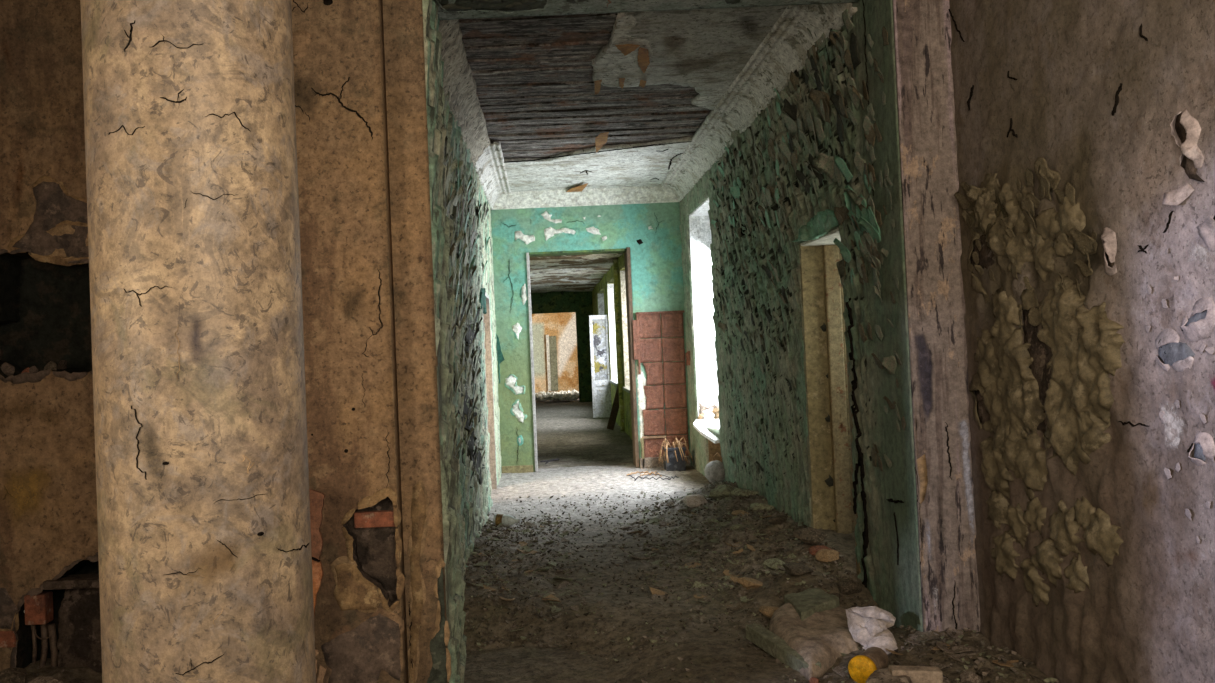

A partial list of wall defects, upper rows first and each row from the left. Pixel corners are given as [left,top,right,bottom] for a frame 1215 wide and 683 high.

crack [124,20,204,52]
crack [108,125,145,135]
crack [160,89,250,131]
crack [295,77,373,139]
flaking render [434,0,711,159]
peeling [1163,108,1205,206]
peeling [698,8,906,486]
crack [124,286,172,307]
peeling [443,135,490,490]
crack [131,406,147,480]
flaking render [321,479,451,683]
flaking render [57,588,102,673]